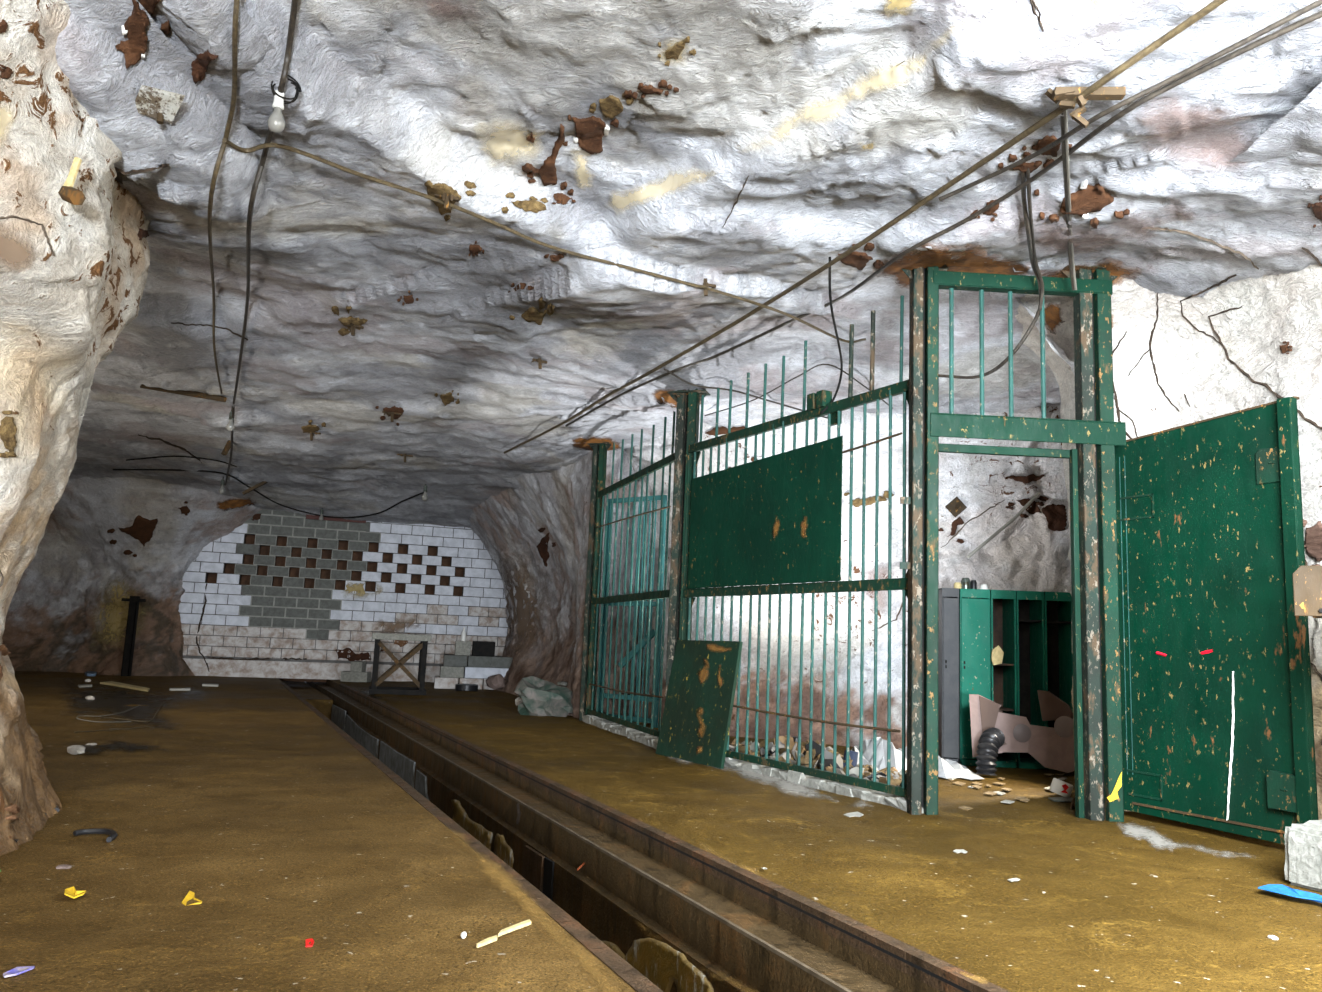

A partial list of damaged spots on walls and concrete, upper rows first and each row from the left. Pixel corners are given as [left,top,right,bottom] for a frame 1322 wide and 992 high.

peeling [115,0,171,69]
peeling [501,36,696,214]
peeling [332,305,368,336]
crack [1113,227,1322,439]
peeling [107,515,158,557]